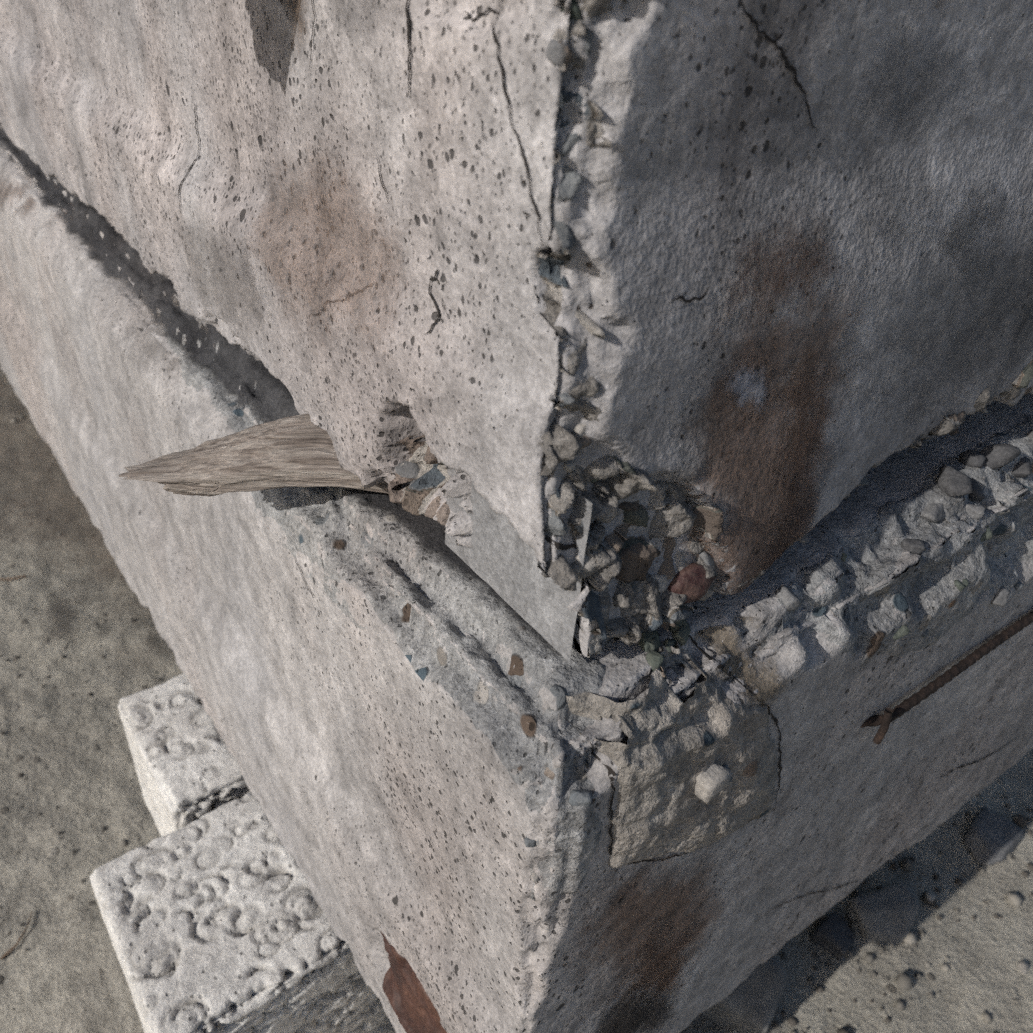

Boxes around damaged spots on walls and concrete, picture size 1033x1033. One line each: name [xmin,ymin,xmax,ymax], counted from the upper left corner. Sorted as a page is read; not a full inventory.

crack [404,0,412,97]
spalling [546,0,628,71]
crack [741,2,816,129]
crack [178,104,199,210]
crack [465,0,542,244]
spalling [552,90,614,200]
spalling [163,323,264,433]
spalling [909,360,1033,449]
spalling [251,218,724,904]
rust [381,932,447,1033]
rust [599,876,712,989]